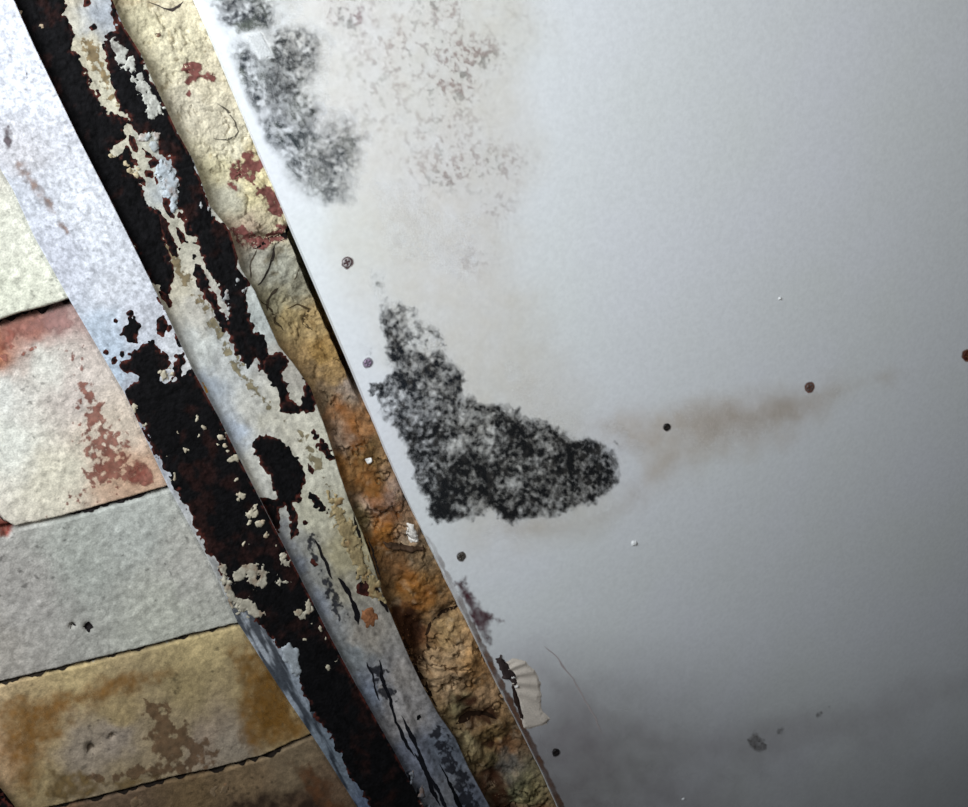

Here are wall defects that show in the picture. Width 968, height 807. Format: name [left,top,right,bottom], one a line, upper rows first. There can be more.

peeling [81,38,120,107]
peeling [181,62,216,97]
water stain [222,0,355,201]
peeling [227,150,289,250]
crack [0,299,67,323]
peeling [165,245,271,410]
peeling [66,345,153,505]
rust [8,0,425,807]
water stain [369,305,618,523]
spalling [406,523,419,543]
water stain [46,701,219,807]
rust [457,696,498,724]